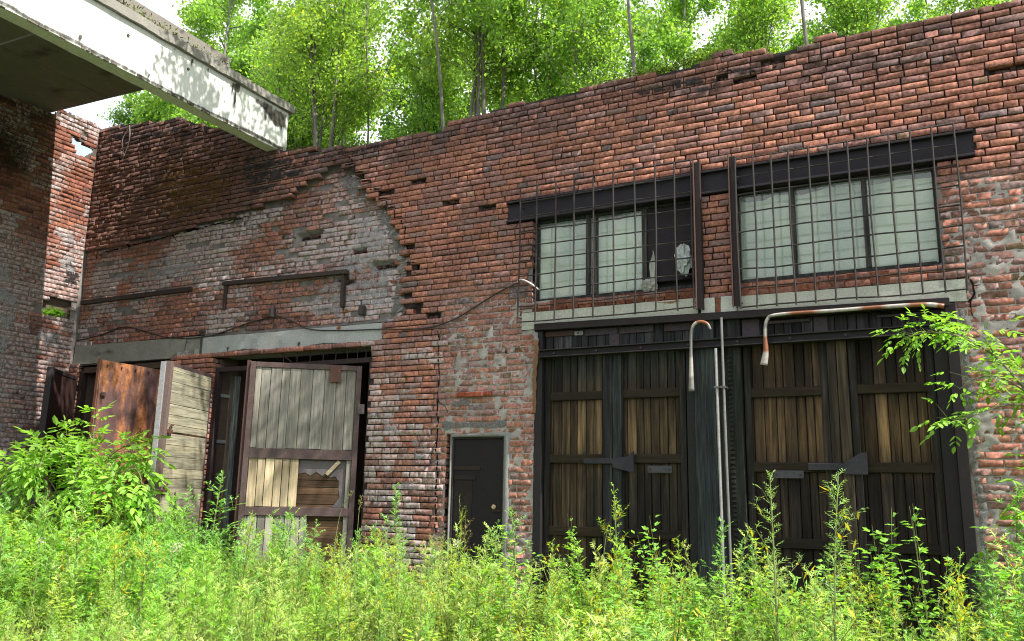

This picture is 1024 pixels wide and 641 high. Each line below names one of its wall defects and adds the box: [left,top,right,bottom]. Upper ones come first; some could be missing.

damp [0,0,308,197]
spalling [342,175,408,316]